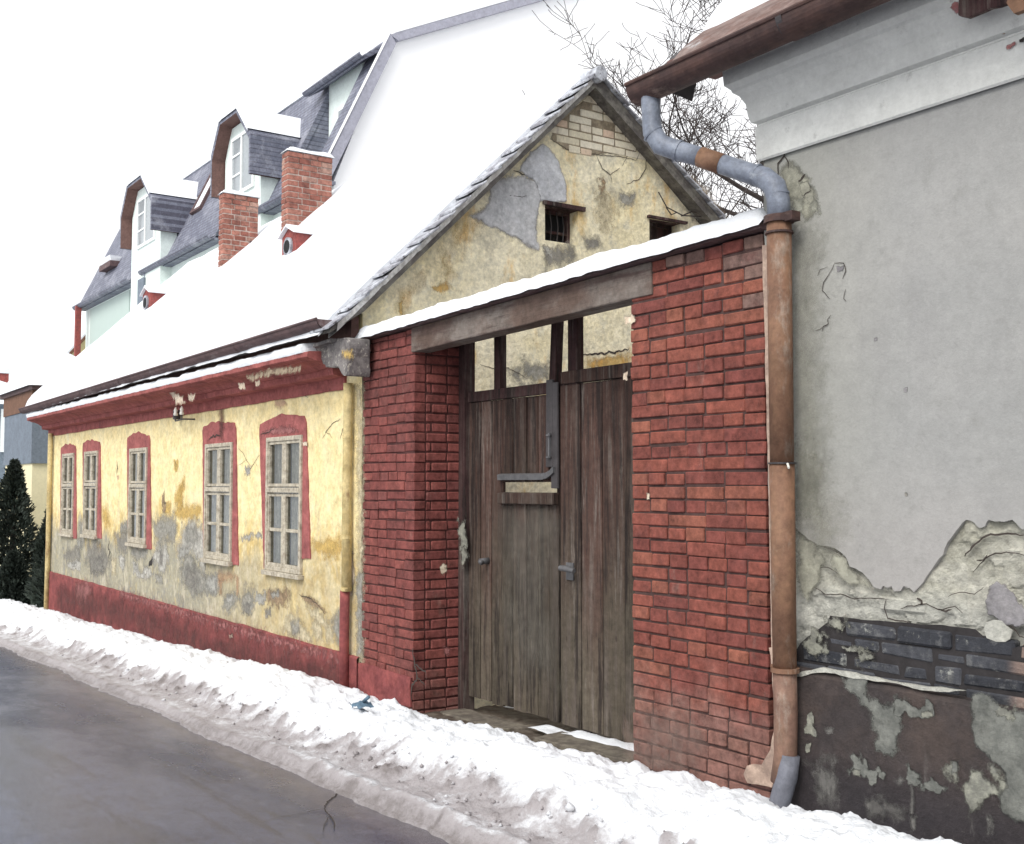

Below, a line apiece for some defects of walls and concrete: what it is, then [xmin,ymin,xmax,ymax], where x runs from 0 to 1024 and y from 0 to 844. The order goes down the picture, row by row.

flaking render [550,95,646,160]
peeling [780,161,821,220]
peeling [238,366,301,389]
peeling [112,459,206,584]
peeling [457,517,470,565]
peeling [119,588,339,663]
flaking render [795,520,1024,823]
water stain [816,759,836,802]
water stain [866,785,916,829]